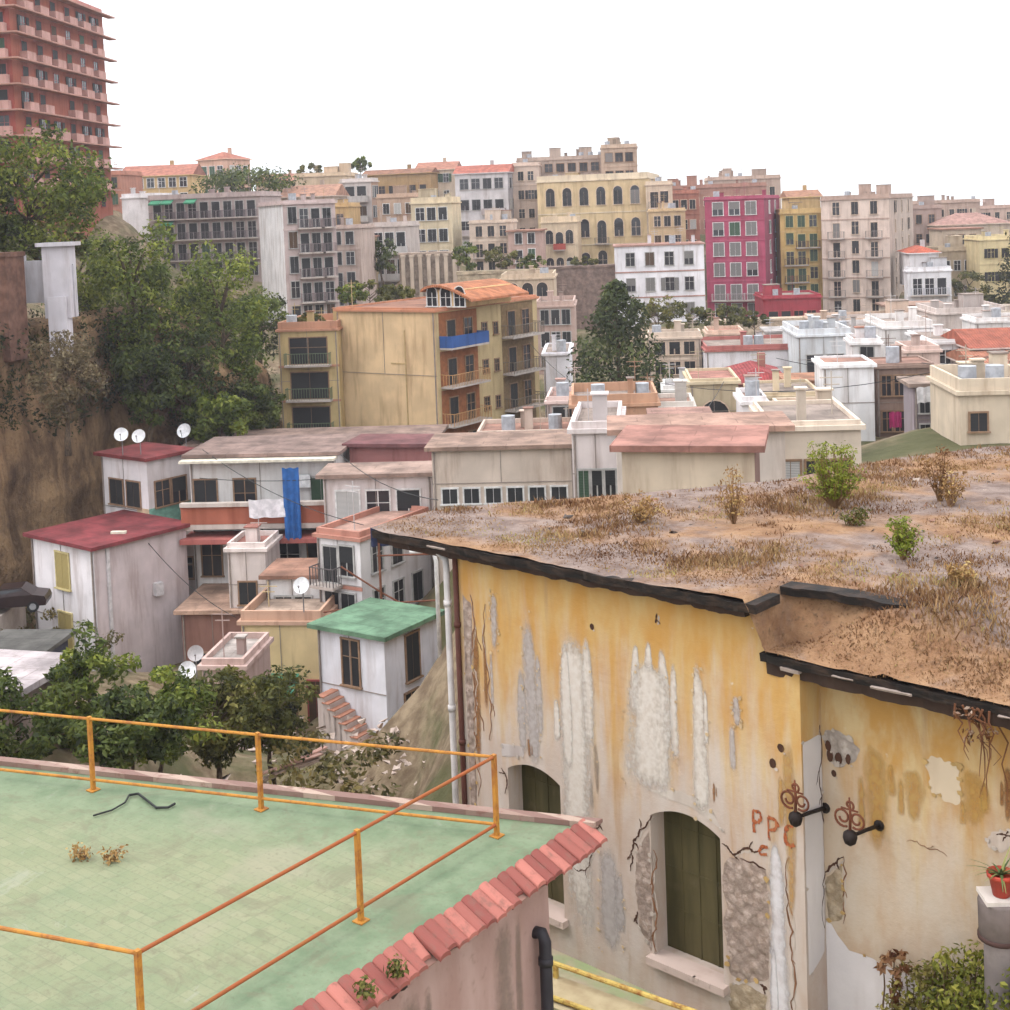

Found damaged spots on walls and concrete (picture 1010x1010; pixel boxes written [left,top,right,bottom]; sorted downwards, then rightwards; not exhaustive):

water stain [488,588,500,701]
crack [627,815,658,953]
flaking render [635,832,654,950]
flaking render [722,857,771,1010]
crack [722,841,797,1010]
crack [816,725,824,823]
crack [822,856,847,928]
flaking render [821,728,860,778]
peeling [922,756,963,805]
peeling [985,828,1010,853]
corrosion [1000,769,1010,819]